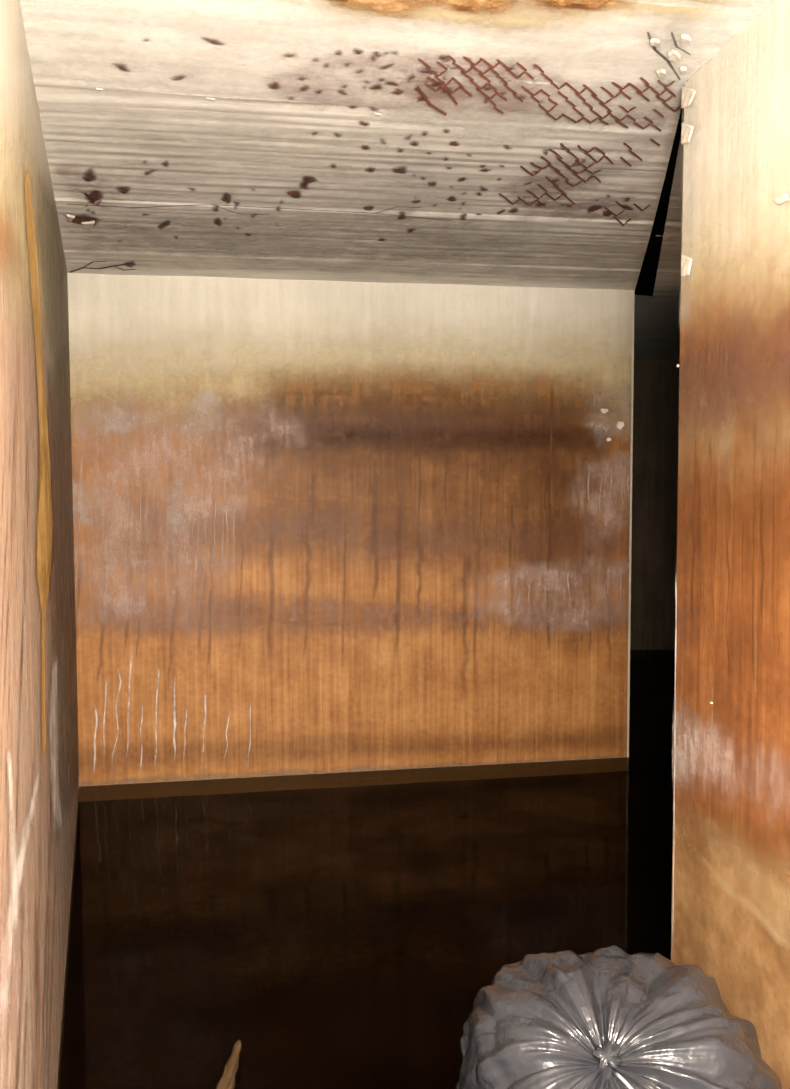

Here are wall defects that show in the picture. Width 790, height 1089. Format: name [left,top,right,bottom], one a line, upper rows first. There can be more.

damp [0,145,632,1089]
rust [334,0,626,27]
rust [588,195,633,216]
damp [671,255,790,1089]